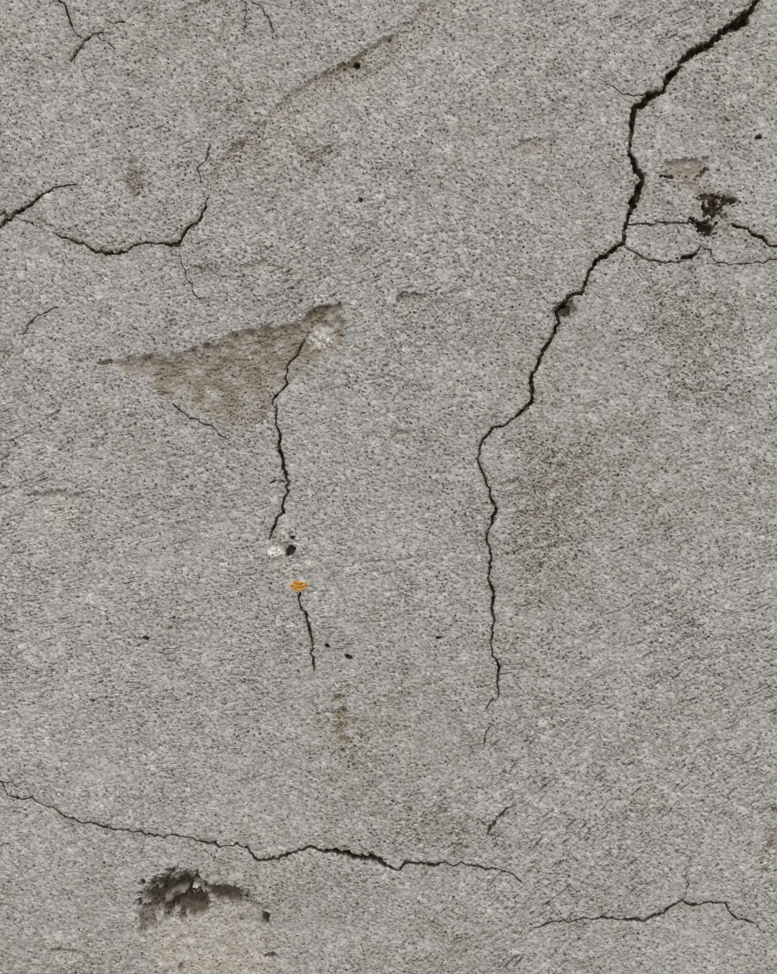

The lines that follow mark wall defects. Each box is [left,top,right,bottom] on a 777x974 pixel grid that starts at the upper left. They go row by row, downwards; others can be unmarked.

crack [56,0,126,64]
crack [240,0,276,35]
crack [0,144,213,301]
crack [20,306,59,338]
crack [171,402,232,443]
peeling [99,301,348,425]
crack [266,339,307,542]
crack [475,0,777,747]
crack [296,591,317,674]
crack [0,779,525,886]
spalling [134,868,281,974]
crack [532,855,762,933]